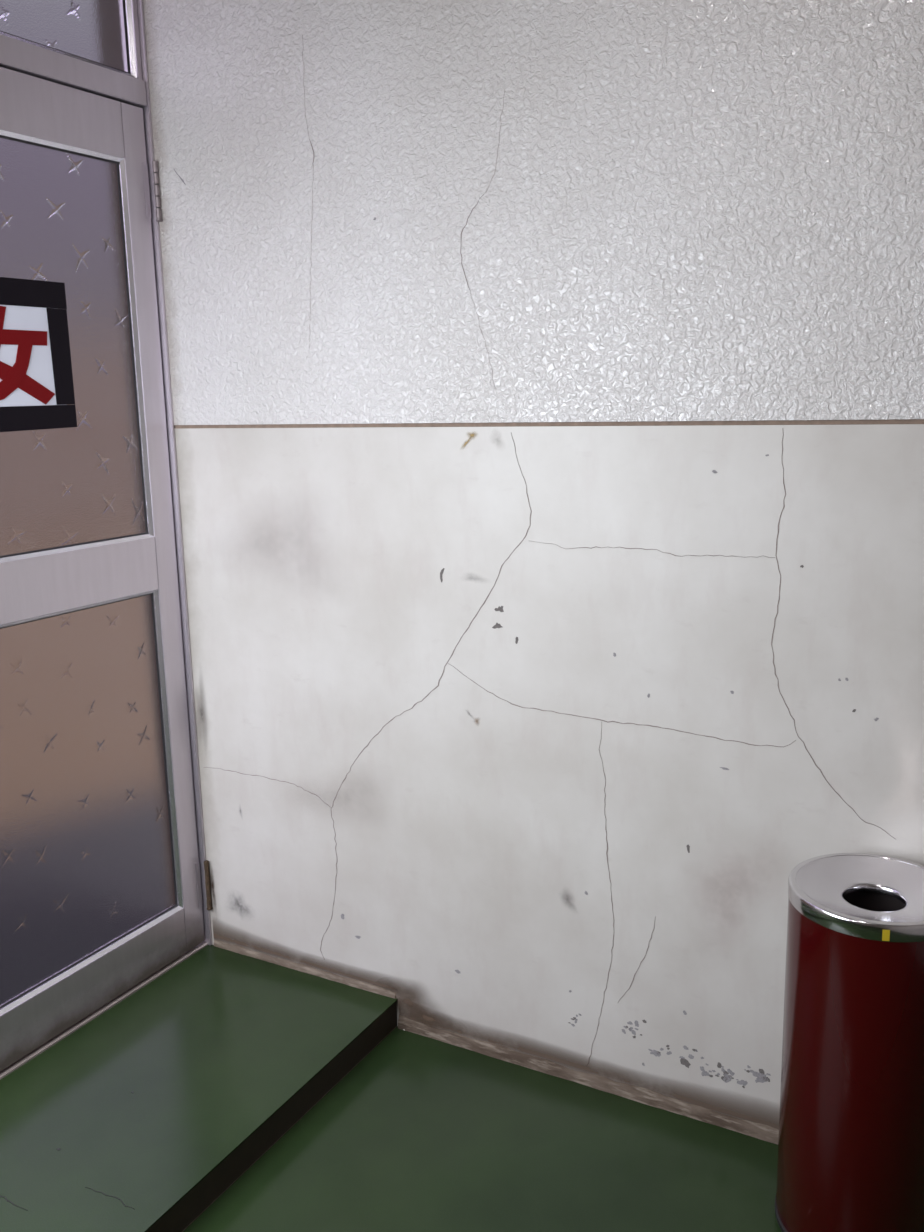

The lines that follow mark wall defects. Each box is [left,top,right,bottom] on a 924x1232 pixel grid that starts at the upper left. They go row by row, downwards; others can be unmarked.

crack [204,433,895,1062]
leakage [213,927,402,992]
peeling [622,1020,647,1038]
leakage [399,1007,779,1130]
peeling [642,1045,771,1088]